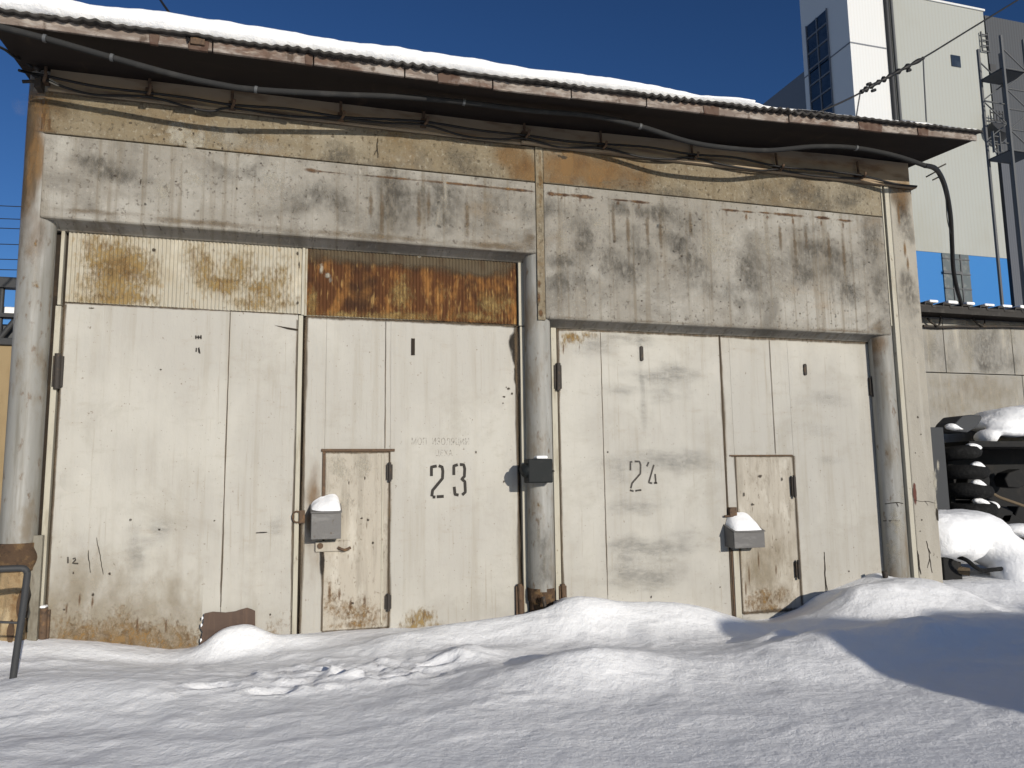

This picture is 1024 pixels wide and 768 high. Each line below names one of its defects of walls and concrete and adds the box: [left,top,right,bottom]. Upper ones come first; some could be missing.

rust [80,235,159,305]
rust [188,247,289,310]
rust [307,244,517,324]
rust [52,606,197,649]
rust [324,589,376,627]